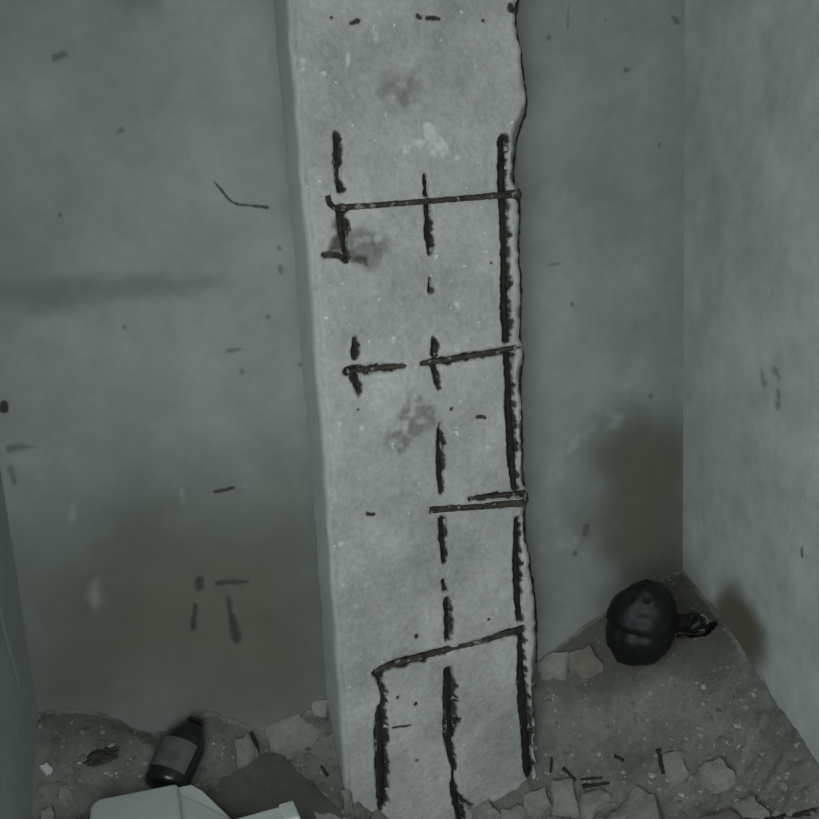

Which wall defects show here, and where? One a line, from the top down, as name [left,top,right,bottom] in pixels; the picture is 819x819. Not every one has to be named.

spalling [332,131,346,193]
spalling [321,210,351,264]
corrosion [328,220,366,263]
spalling [420,134,526,501]
spalling [343,337,395,395]
spalling [438,516,448,563]
spalling [443,588,454,640]
spalling [500,522,536,773]
spalling [372,649,445,810]
spalling [442,670,461,771]
spalling [450,781,473,819]